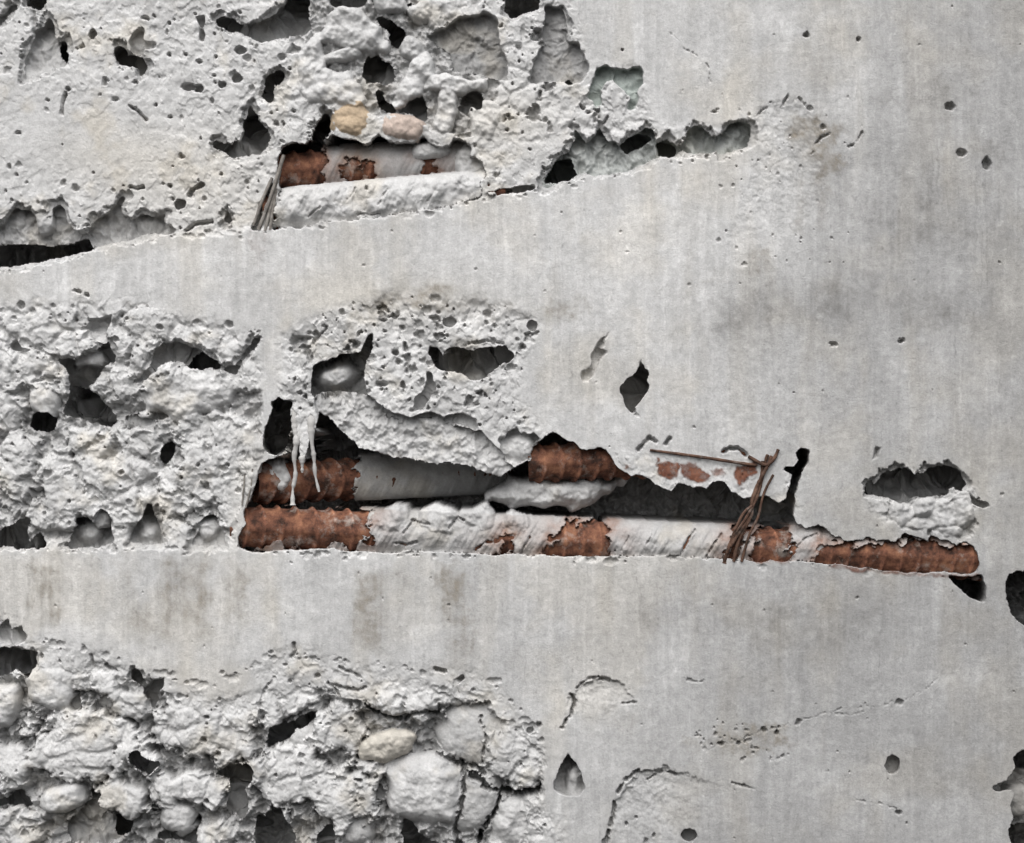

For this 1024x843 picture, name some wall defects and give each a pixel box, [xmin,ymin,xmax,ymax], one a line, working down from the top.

spalling [212,70,286,159]
spalling [195,0,311,55]
spalling [277,114,377,188]
spalling [362,55,429,122]
spalling [426,0,644,111]
peeling [541,92,831,273]
spalling [0,185,187,269]
spalling [30,310,170,433]
spalling [130,286,996,603]
corrosion [656,458,758,485]
spalling [0,506,46,550]
spalling [0,617,38,680]